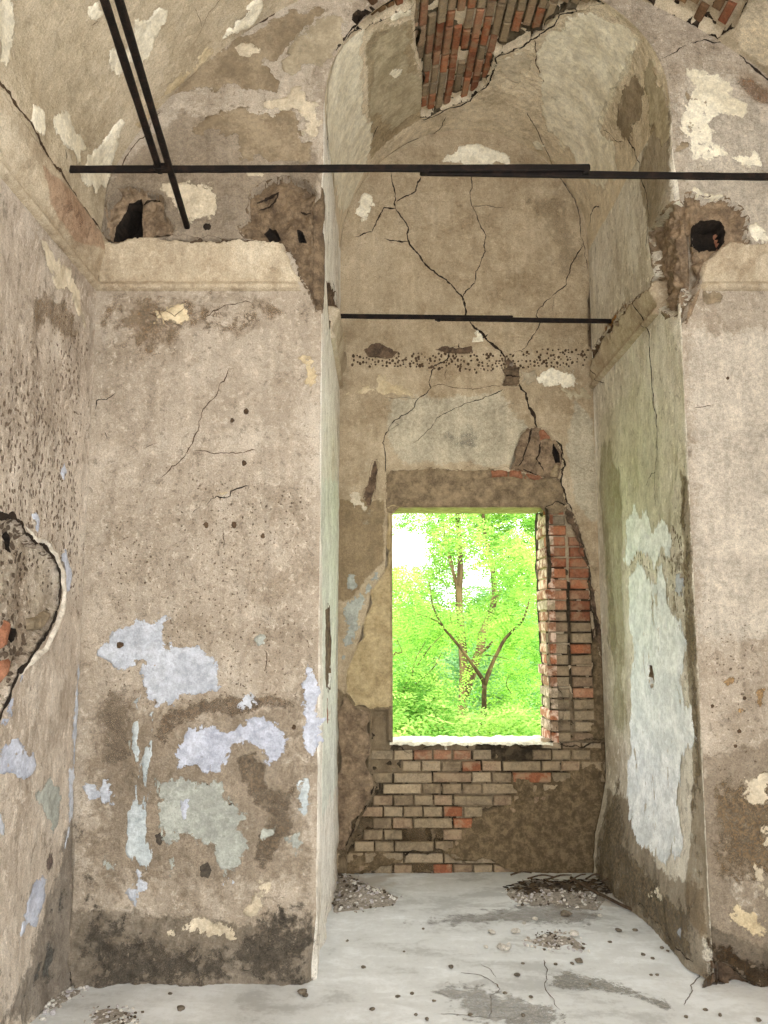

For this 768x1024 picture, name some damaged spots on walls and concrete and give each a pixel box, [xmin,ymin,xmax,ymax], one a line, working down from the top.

peeling [31,0,762,330]
crack [341,11,599,510]
crack [161,369,254,478]
crack [193,485,249,512]
flaking render [509,426,564,479]
flaking render [0,511,72,725]
peeling [97,612,222,708]
flaking render [152,501,606,886]
peeling [623,504,697,866]
water stain [685,600,701,818]
water stain [81,876,315,989]
water stain [596,779,693,958]